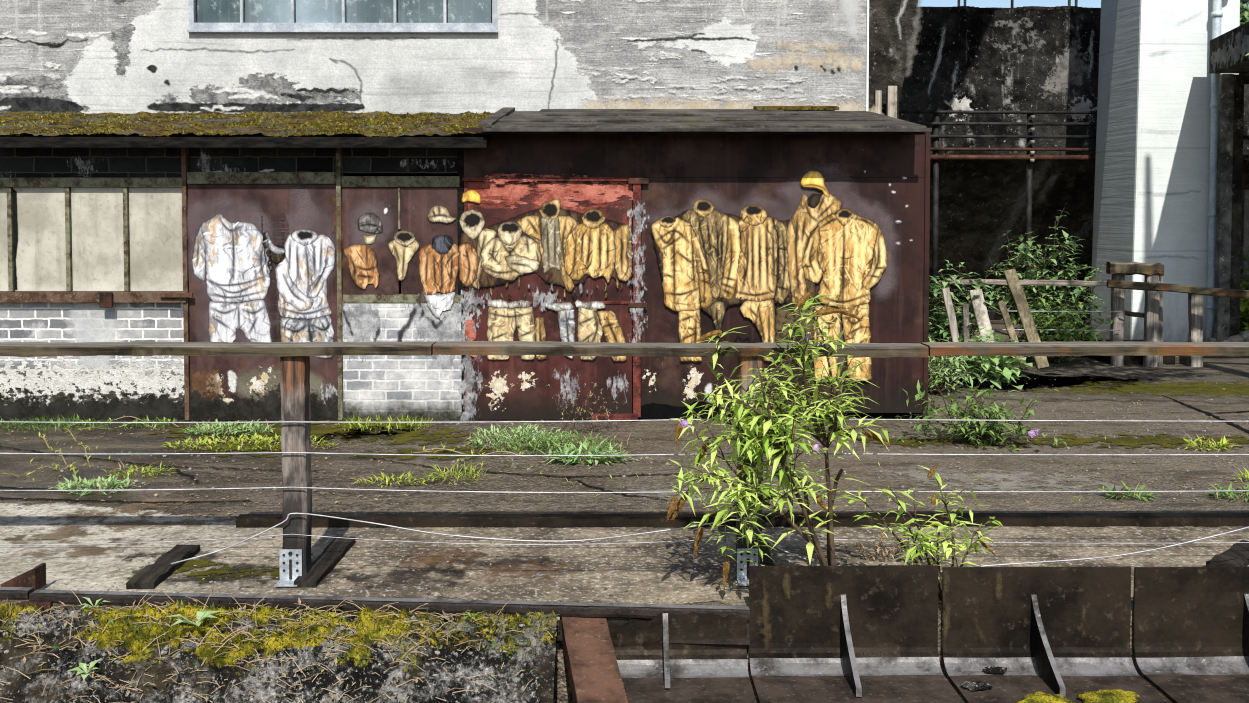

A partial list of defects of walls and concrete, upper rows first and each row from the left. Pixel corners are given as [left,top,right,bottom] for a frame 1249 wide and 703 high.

crack [0,30,100,47]
peeling [0,0,853,114]
crack [548,38,558,109]
peeling [841,0,858,34]
damp [986,18,1046,53]
damp [1041,44,1091,100]
peeling [477,174,649,343]
damp [0,372,281,421]
damp [310,376,346,421]